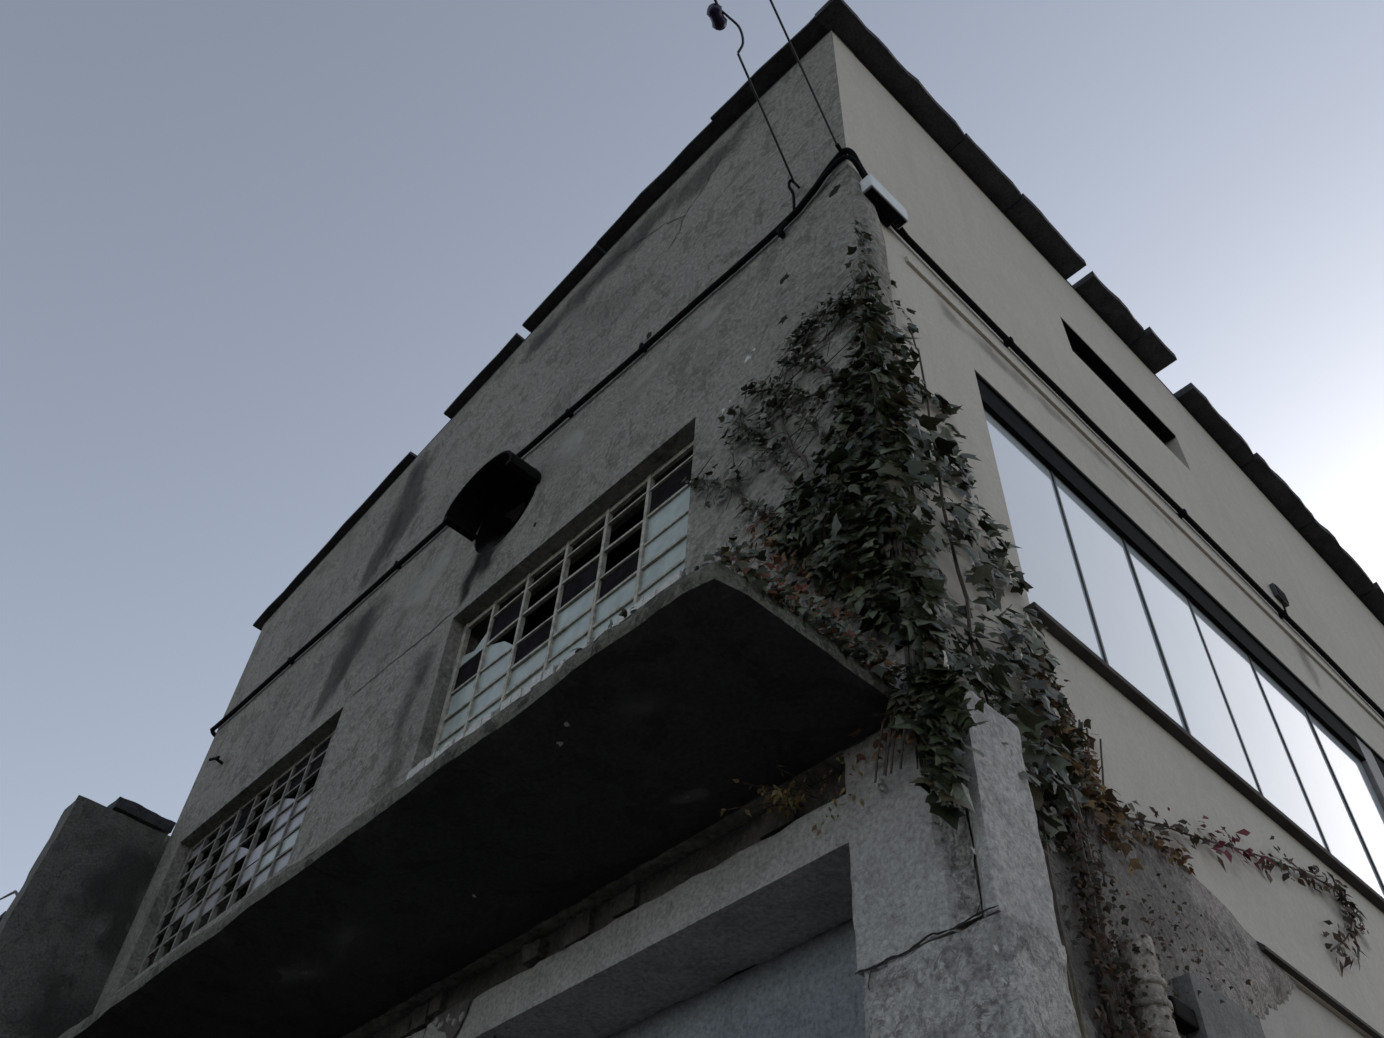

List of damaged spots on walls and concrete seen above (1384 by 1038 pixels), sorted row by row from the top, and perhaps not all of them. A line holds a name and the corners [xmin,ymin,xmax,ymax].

leakage [366,461,424,581]
leakage [315,611,374,714]
crack [855,905,999,991]
spalling [433,997,471,1038]